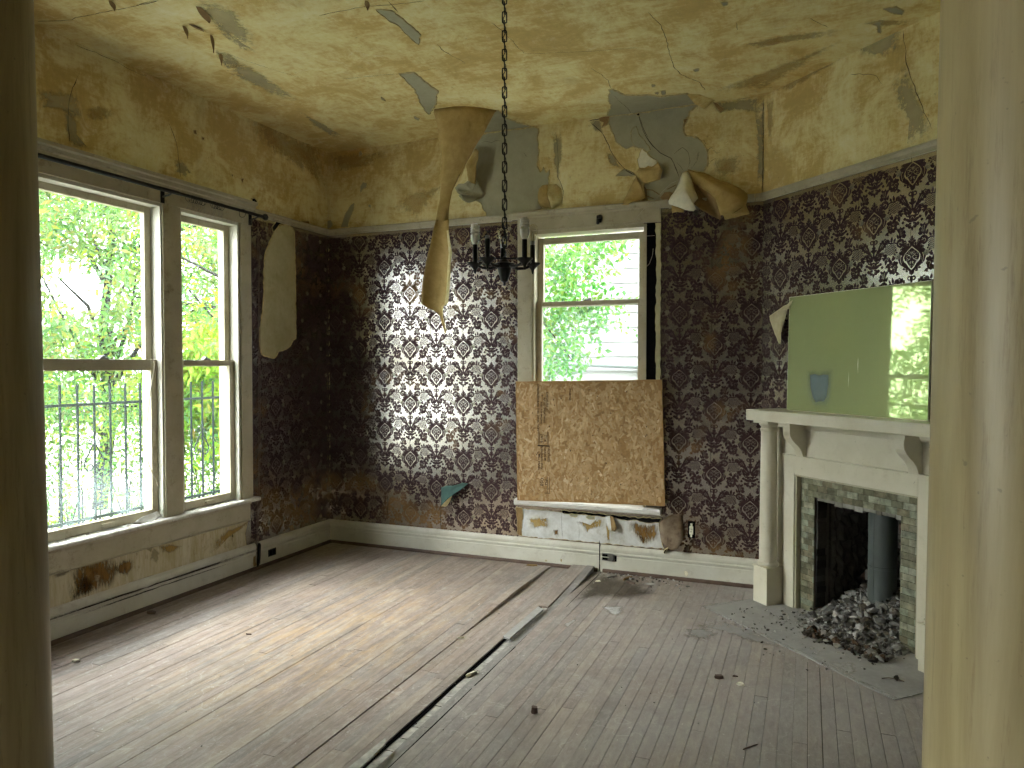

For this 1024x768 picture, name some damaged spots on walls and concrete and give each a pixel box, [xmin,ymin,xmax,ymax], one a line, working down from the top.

peeling [375,9,421,45]
peeling [399,72,439,121]
crack [494,24,706,176]
peeling [598,84,709,201]
crack [903,34,932,129]
peeling [259,220,310,359]
flaking render [49,521,257,608]
flaking render [522,508,668,554]
crack [388,635,527,768]